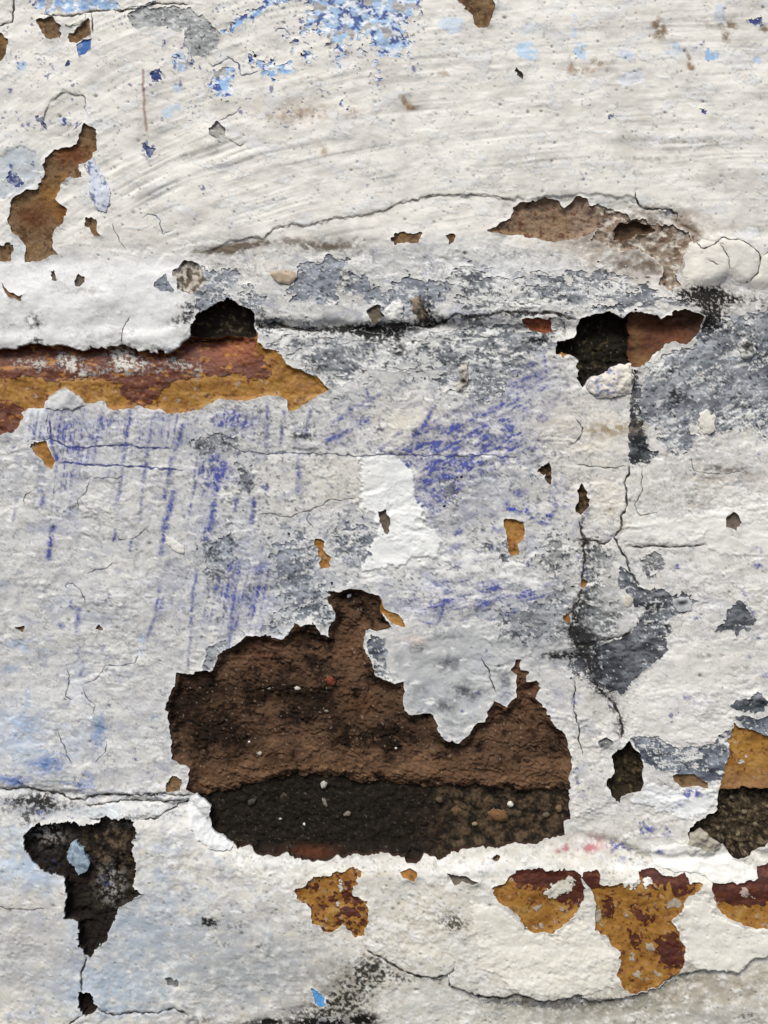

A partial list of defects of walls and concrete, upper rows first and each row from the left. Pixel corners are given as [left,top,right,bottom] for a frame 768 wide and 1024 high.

peeling [0,124,111,262]
crack [198,193,508,253]
crack [632,192,678,220]
peeling [0,196,768,469]
peeling [188,432,254,494]
crack [568,420,703,754]
spalling [164,509,572,882]
spalling [26,816,139,956]
crack [1,787,190,820]
peeling [295,867,369,937]
peeling [492,692,768,994]
spalling [80,992,98,1012]